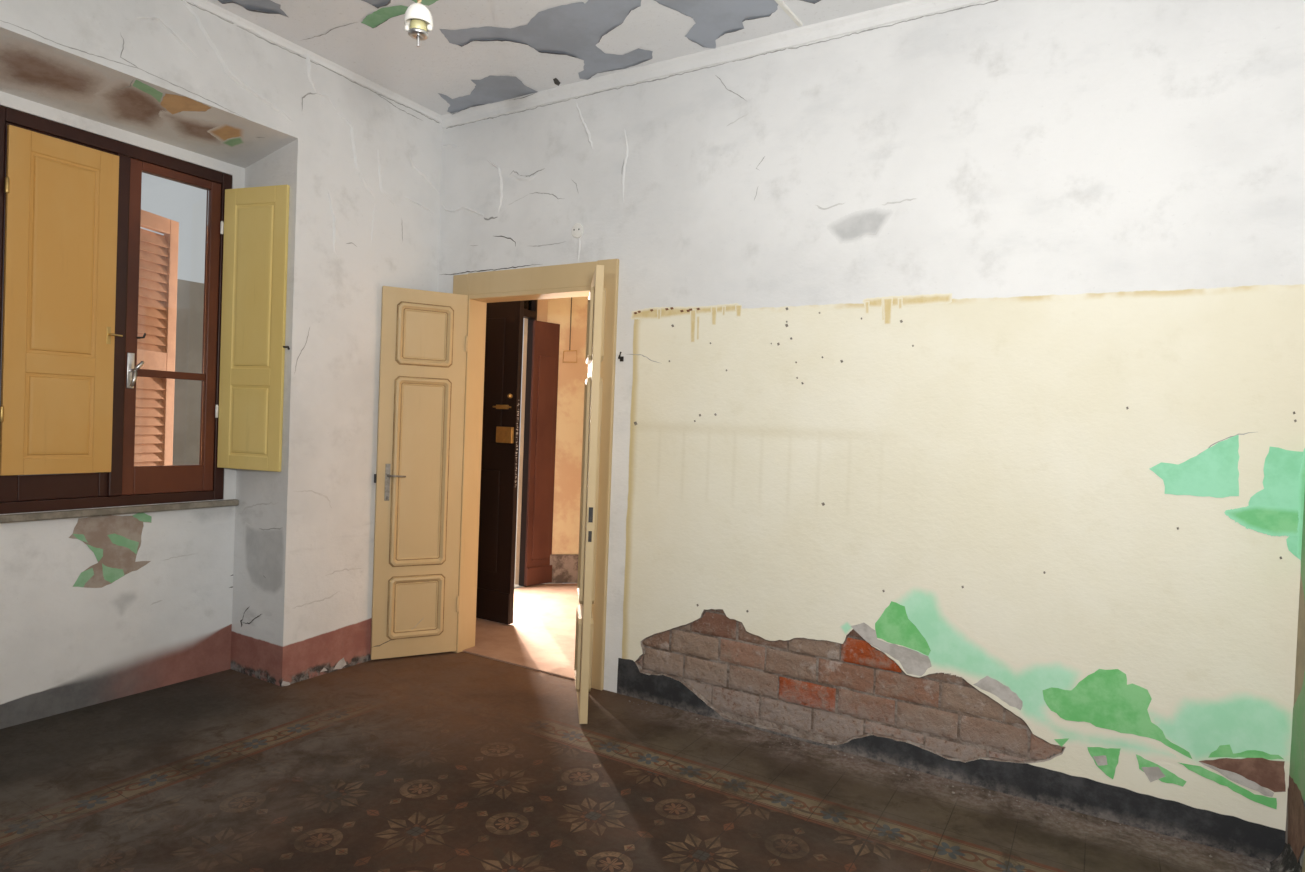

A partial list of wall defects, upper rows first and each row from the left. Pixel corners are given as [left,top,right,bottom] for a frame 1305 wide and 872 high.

leakage [0,35,225,146]
crack [0,20,246,119]
peeling [361,0,438,28]
peeling [438,76,537,114]
crack [187,0,998,129]
peeling [440,0,778,80]
peeling [816,198,915,244]
peeling [69,513,152,588]
leakage [184,500,286,596]
spalling [635,601,1069,763]
peeling [1042,432,1305,872]